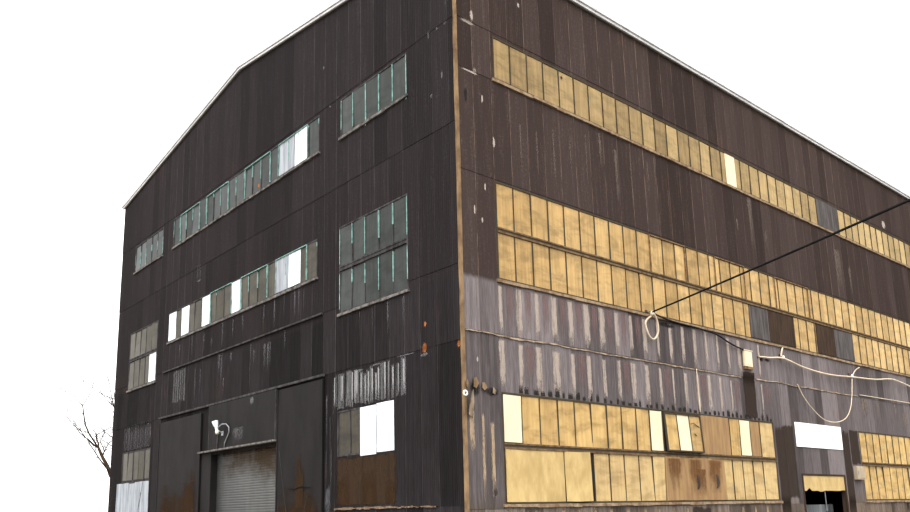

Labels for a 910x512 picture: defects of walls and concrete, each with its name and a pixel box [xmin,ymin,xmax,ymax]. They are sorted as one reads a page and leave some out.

peeling [172,368,185,402]
peeling [334,352,414,409]
rust [669,459,720,488]